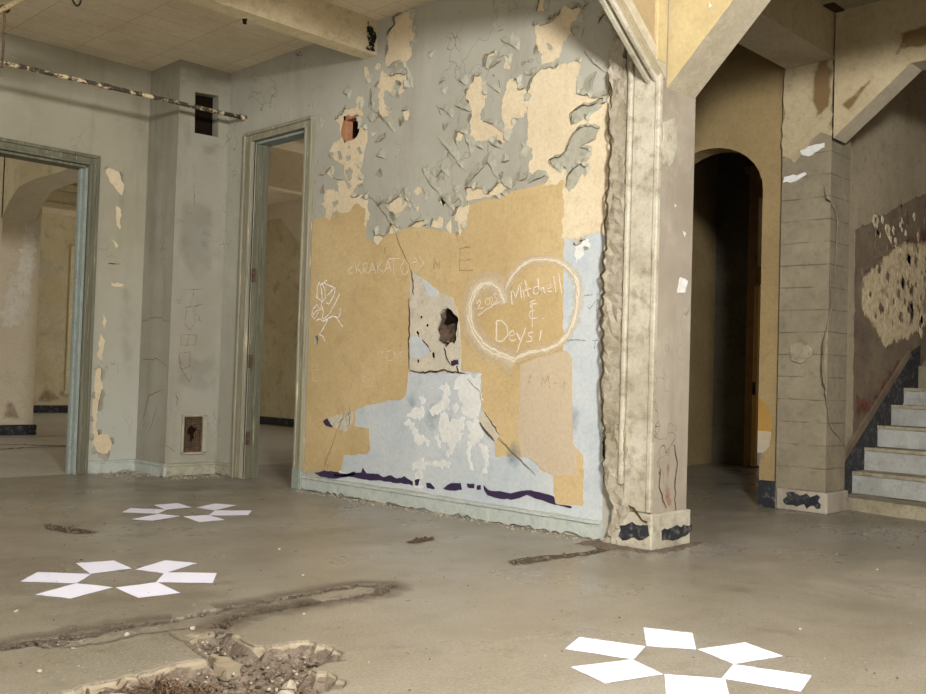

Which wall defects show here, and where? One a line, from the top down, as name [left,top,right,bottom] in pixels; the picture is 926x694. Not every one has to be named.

peeling [364,8,418,124]
peeling [104,166,125,195]
peeling [322,96,510,245]
peeling [661,118,677,171]
flaking render [453,0,649,545]
peeling [677,277,688,293]
peeling [858,203,926,348]
flaking render [404,270,500,489]
peeling [661,524,692,541]
spalling [59,629,355,694]